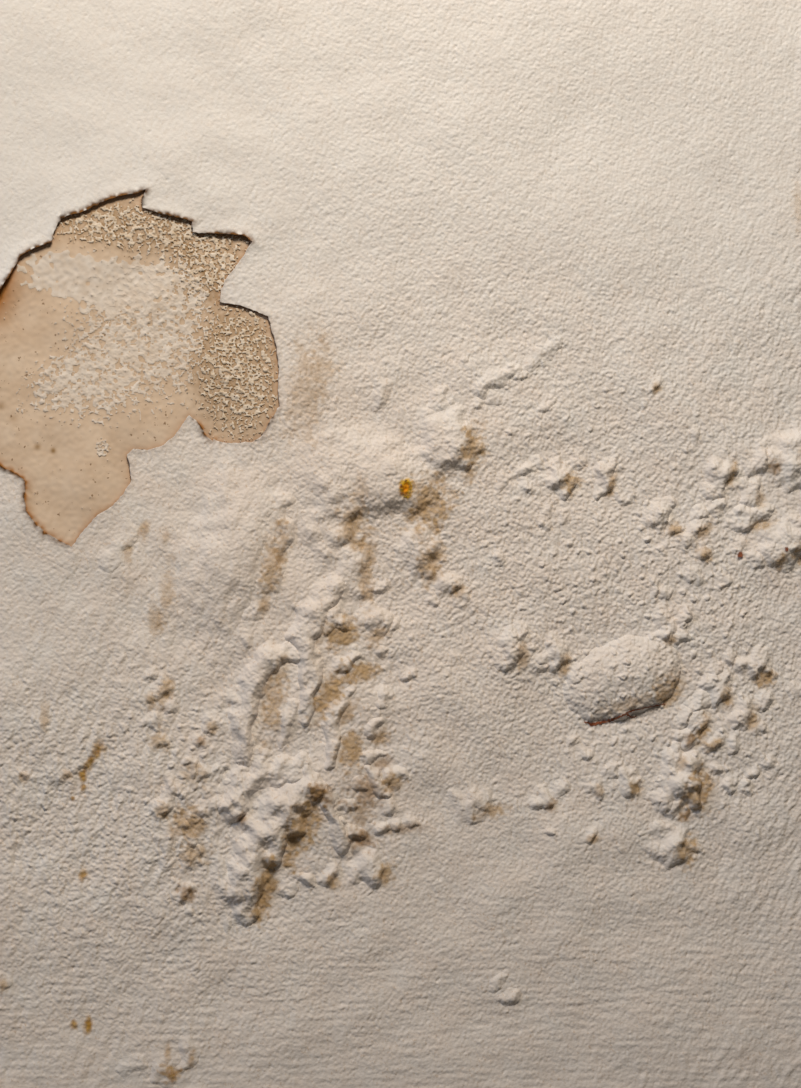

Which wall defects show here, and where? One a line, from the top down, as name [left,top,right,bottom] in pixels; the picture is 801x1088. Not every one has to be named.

peeling [0,168,301,569]
damp [461,428,484,471]
damp [399,477,451,531]
damp [328,616,357,645]
damp [313,664,375,720]
damp [683,764,711,808]
damp [251,788,326,921]